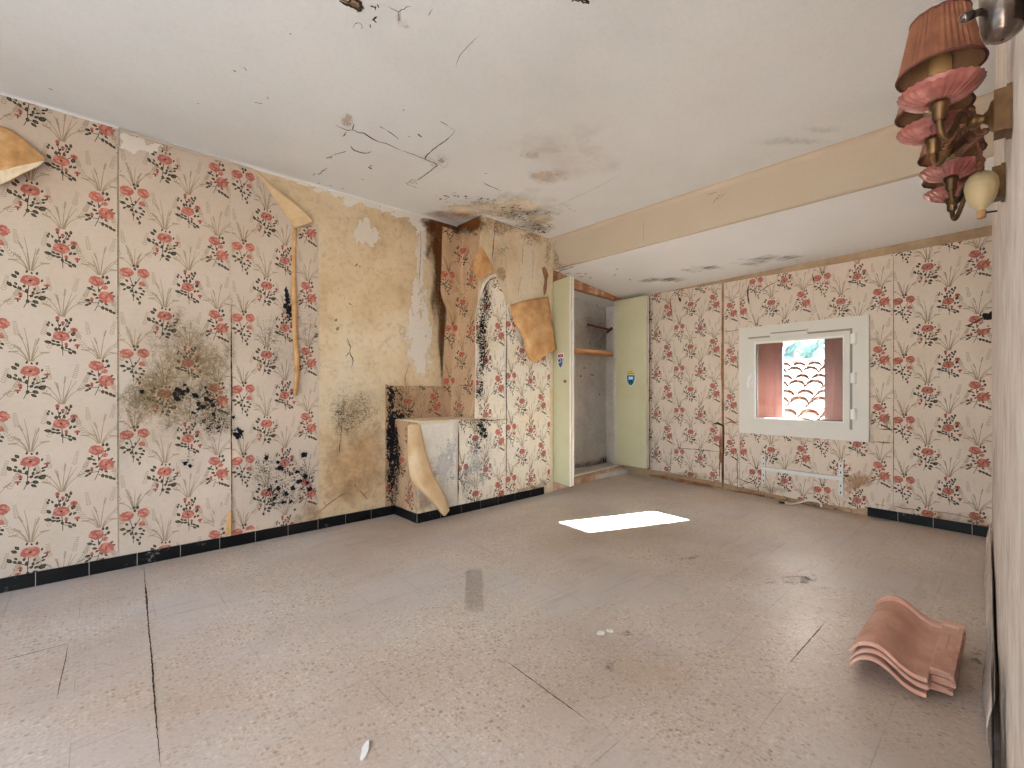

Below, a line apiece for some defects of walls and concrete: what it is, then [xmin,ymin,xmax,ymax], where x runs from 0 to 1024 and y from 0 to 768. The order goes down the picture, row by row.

spalling [339,0,379,28]
crack [313,121,455,188]
leakage [440,195,551,271]
leakage [123,327,244,439]
leakage [246,452,315,515]
leakage [327,383,415,506]
flaking render [418,422,457,508]
crack [9,645,68,696]
crack [144,571,161,767]
crack [509,663,591,723]